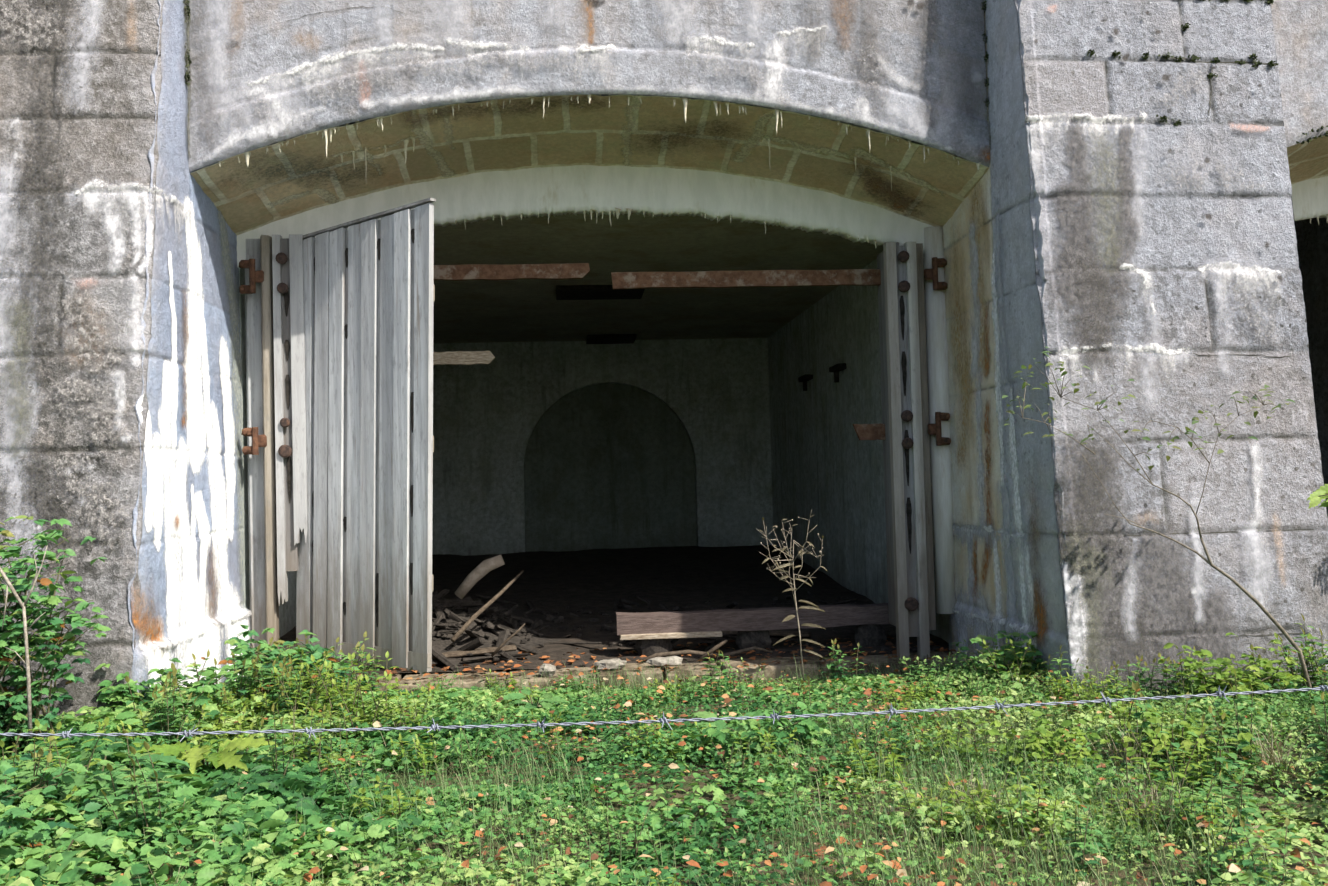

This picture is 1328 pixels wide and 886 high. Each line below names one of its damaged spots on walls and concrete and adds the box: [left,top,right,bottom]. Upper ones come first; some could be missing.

rust [585,0,605,43]
water stain [0,0,252,692]
water stain [1025,113,1190,399]
rust [131,587,164,652]
rust [972,403,993,607]
water stain [1054,428,1246,695]
water stain [1243,445,1270,606]